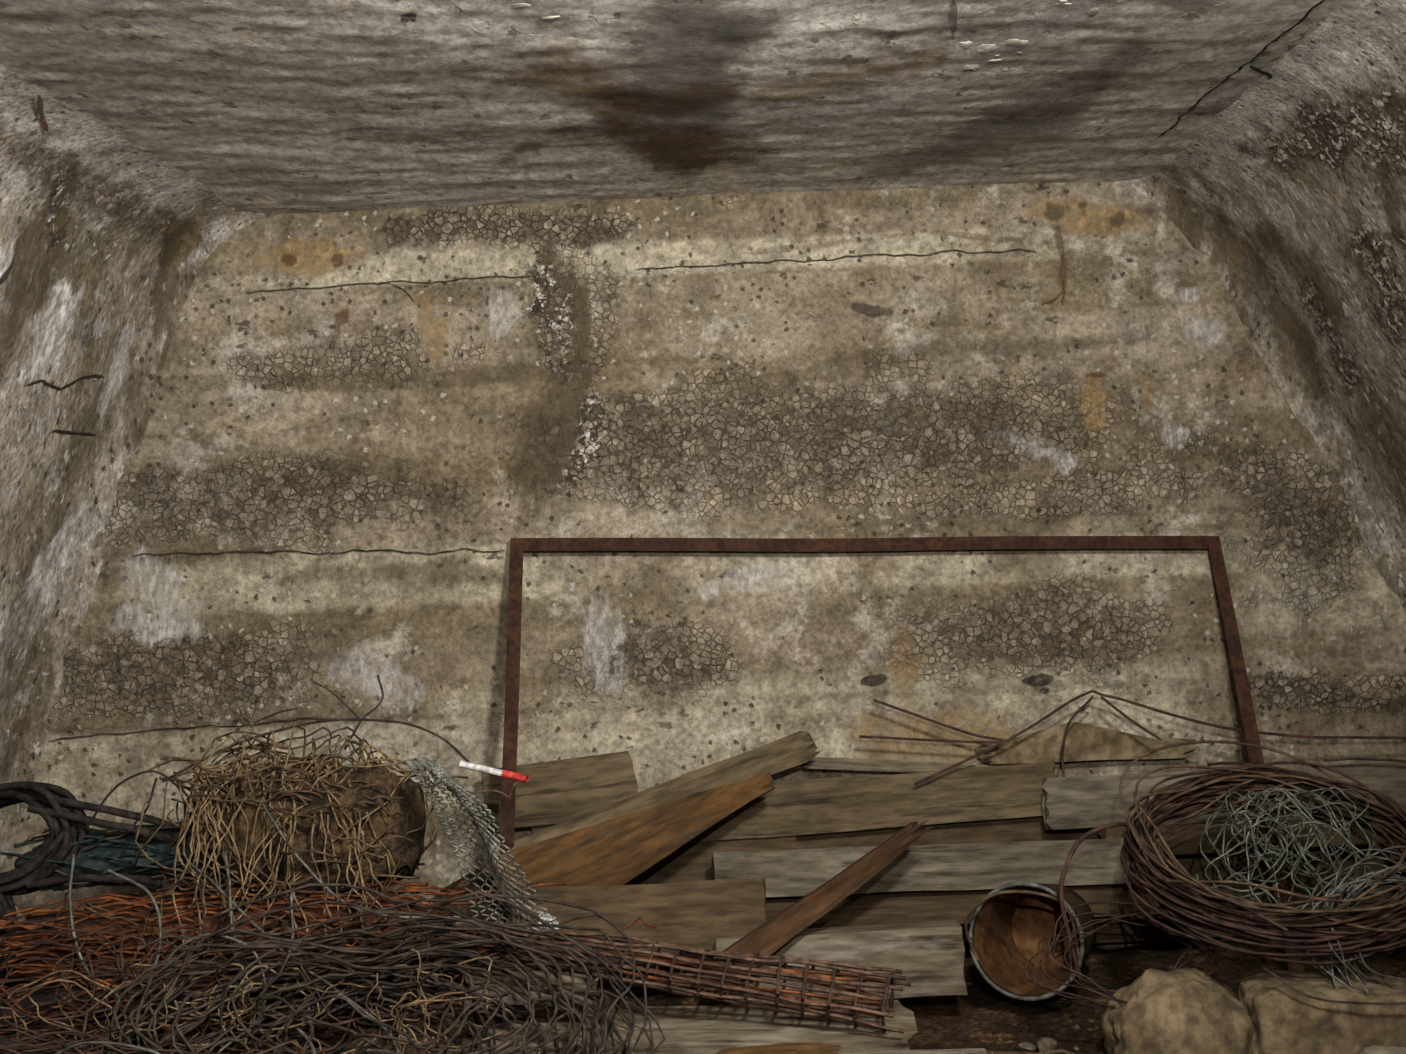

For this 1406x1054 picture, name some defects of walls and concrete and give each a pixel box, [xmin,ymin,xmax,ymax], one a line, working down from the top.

damp [609,0,786,192]
crack [0,261,14,285]
crack [26,374,104,390]
crack [52,428,96,436]